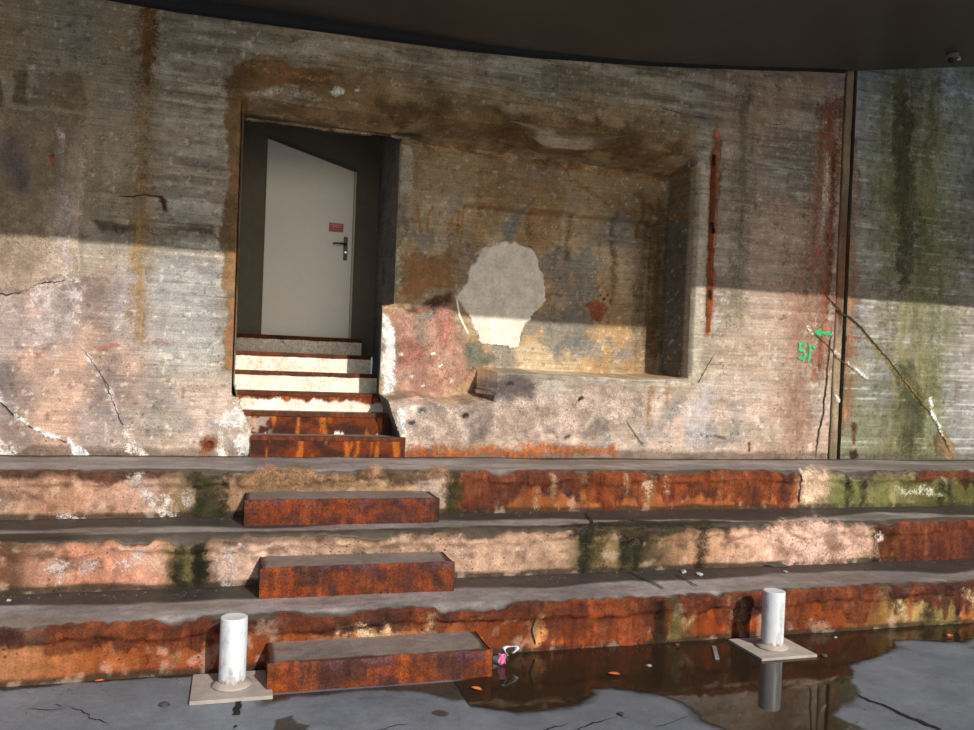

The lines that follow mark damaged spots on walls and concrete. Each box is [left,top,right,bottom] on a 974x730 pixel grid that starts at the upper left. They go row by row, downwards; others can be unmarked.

crack [116,194,168,211]
leakage [219,59,689,372]
rust [705,118,722,336]
leakage [889,78,974,292]
crack [0,275,80,296]
spalling [387,293,647,443]
crack [0,402,89,455]
leakage [896,360,925,457]
rust [406,442,795,513]
rust [44,616,213,658]
rust [784,579,974,630]
crack [545,717,615,730]